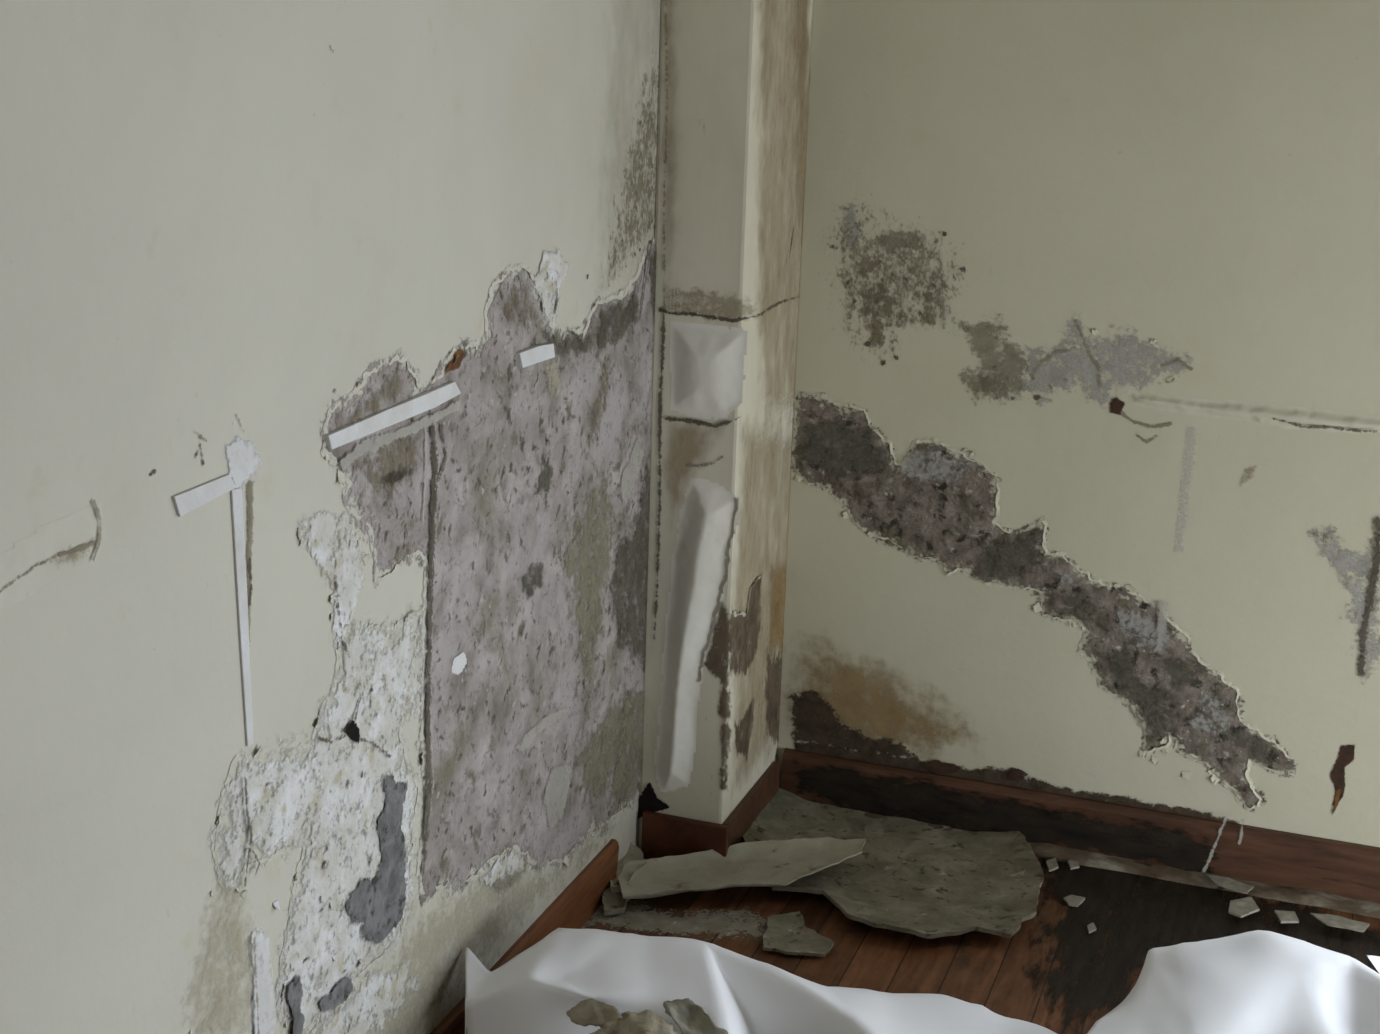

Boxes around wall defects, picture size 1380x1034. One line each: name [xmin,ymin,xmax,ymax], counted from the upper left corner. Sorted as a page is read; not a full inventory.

leakage [608,0,808,397]
leakage [831,205,1052,400]
crack [0,500,102,592]
flaking render [209,237,669,1034]
leakage [610,467,650,672]
leakage [735,441,1380,1032]
rust [1330,745,1355,814]